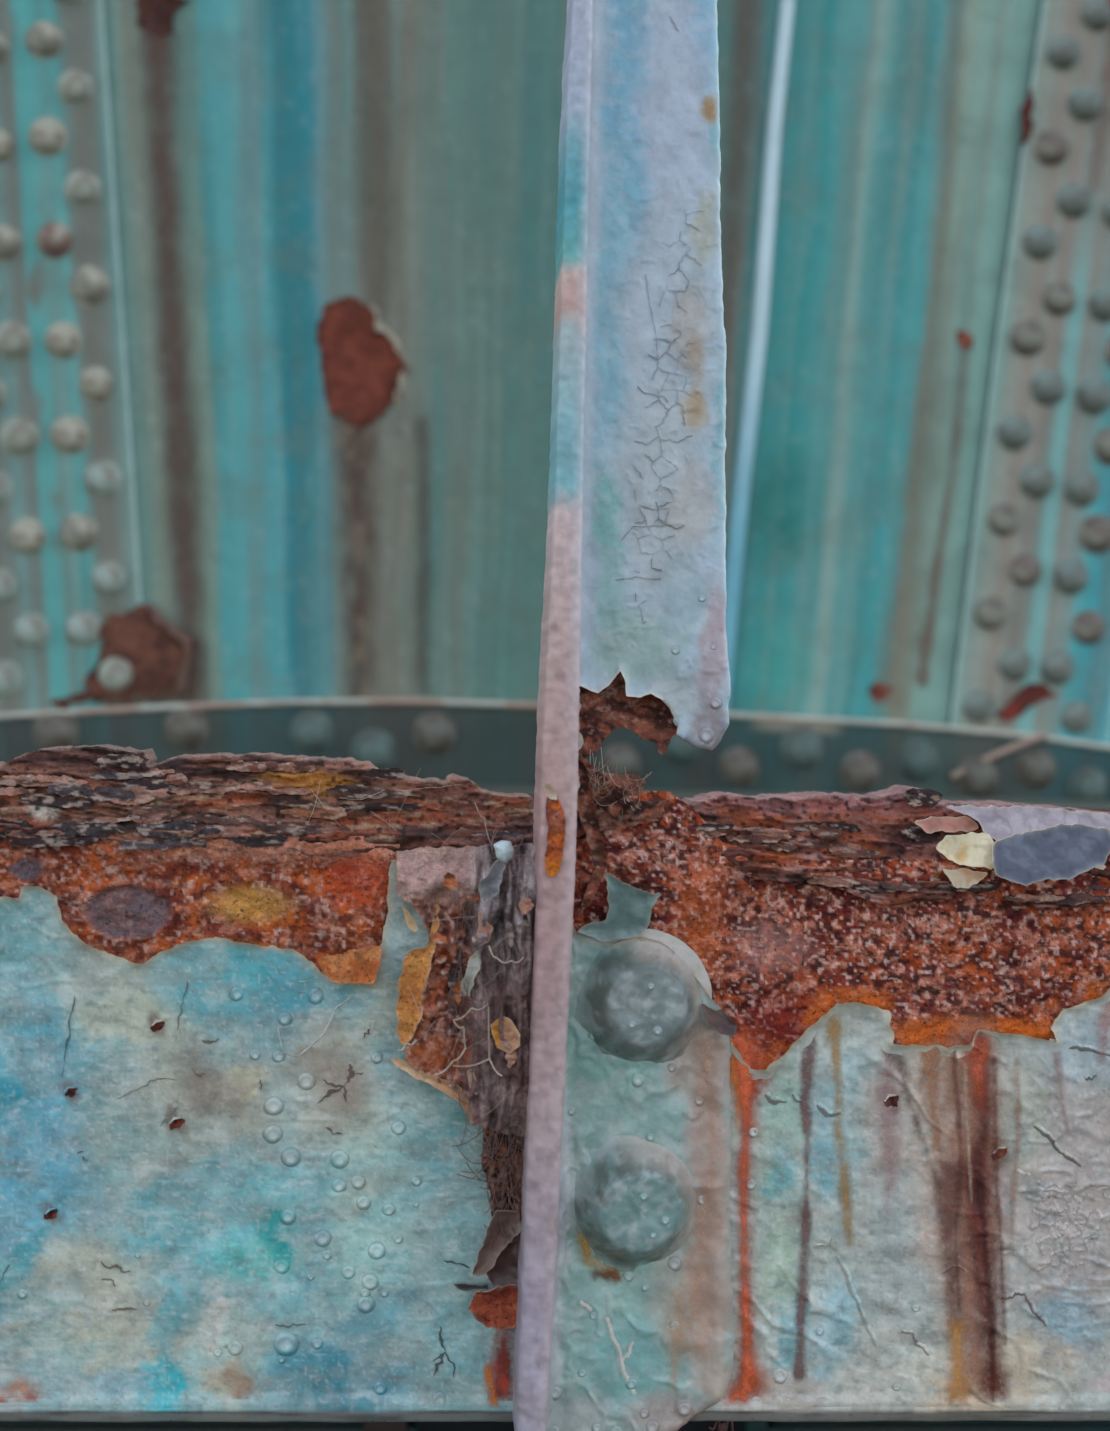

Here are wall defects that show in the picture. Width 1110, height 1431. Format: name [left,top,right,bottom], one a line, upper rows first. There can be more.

peeling [316,296,411,427]
crack [615,209,704,623]
rust [918,492,949,685]
peeling [51,602,196,710]
peeling [915,804,1110,888]
peeling [318,946,382,984]
peeling [391,840,537,1330]
rust [0,672,1110,1405]
rust [708,1421,734,1431]